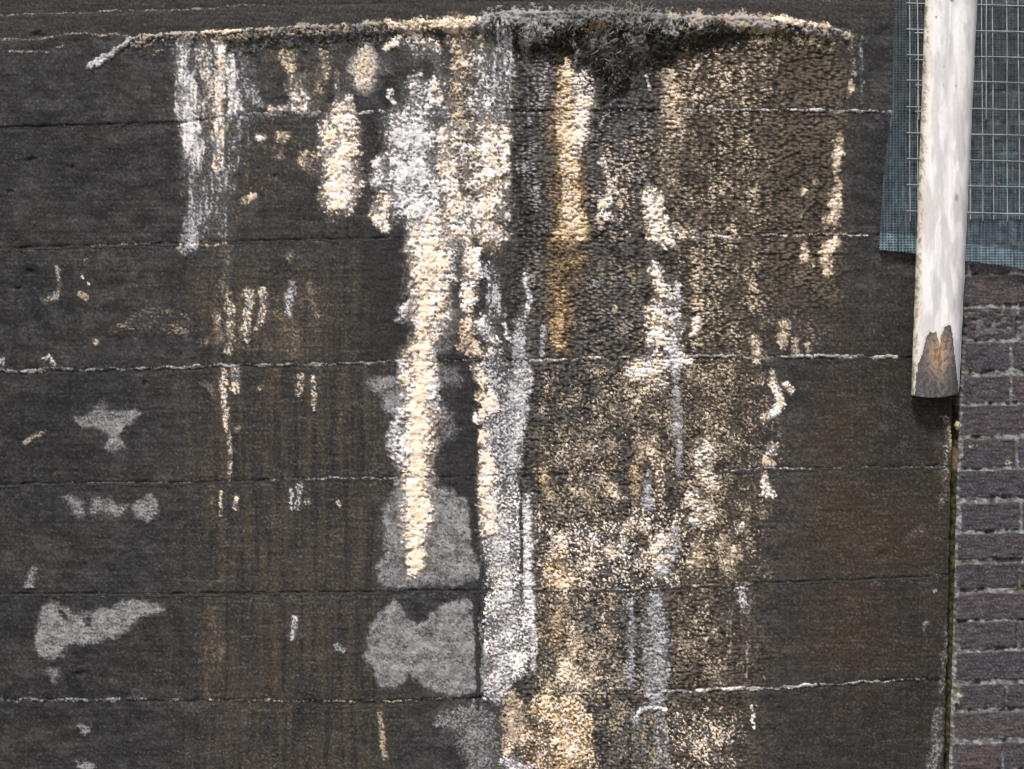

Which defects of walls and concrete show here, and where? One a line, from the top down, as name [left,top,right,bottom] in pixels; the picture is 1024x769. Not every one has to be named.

damp [848,35,865,96]
damp [597,158,621,221]
damp [641,184,695,250]
damp [800,133,845,277]
damp [173,14,547,703]
damp [749,335,762,364]
damp [775,319,811,357]
damp [603,260,753,577]
damp [760,371,795,424]
damp [759,441,779,520]
damp [736,584,748,614]
damp [618,591,671,769]